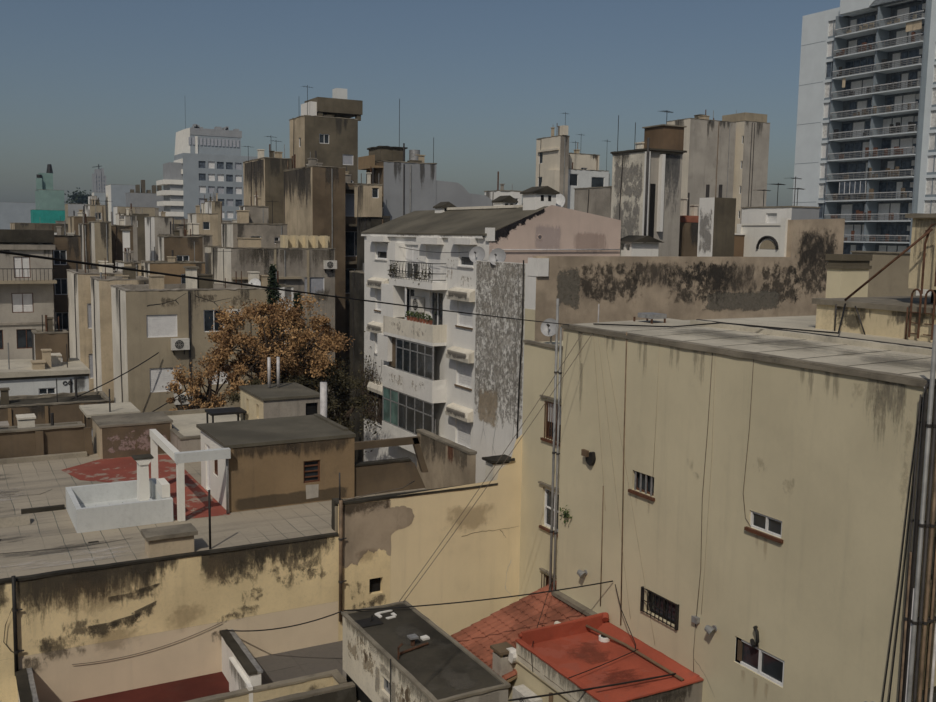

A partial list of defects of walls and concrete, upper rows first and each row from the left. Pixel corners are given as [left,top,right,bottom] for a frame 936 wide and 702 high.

leakage [611,154,642,238]
leakage [557,210,836,312]
peeling [447,259,525,428]
leakage [201,536,335,584]
spalling [343,500,414,568]
leakage [17,559,176,671]
peeling [347,636,375,677]
peeling [396,685,424,702]